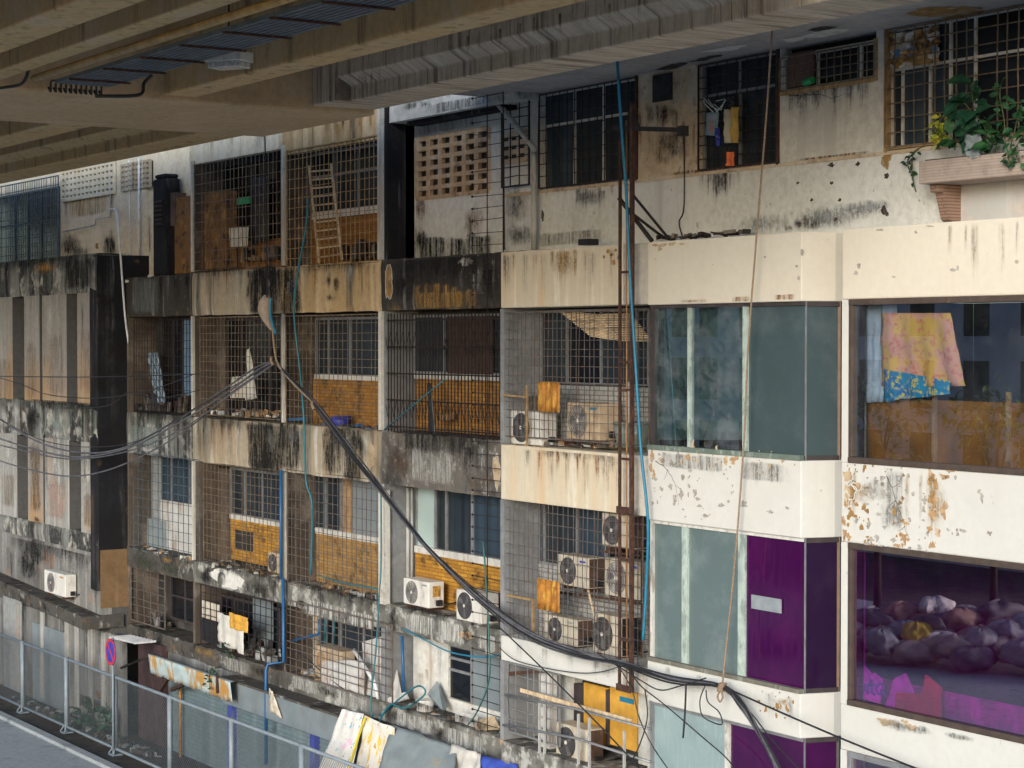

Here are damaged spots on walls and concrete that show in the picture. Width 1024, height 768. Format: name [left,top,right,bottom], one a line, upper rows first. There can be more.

peeling [881,150,892,179]
leakage [752,202,886,231]
leakage [397,192,529,296]
leakage [136,262,361,313]
leakage [27,399,93,438]
leakage [203,417,302,472]
leakage [323,428,362,480]
peeling [649,439,795,520]
peeling [841,464,966,552]
leakage [7,539,91,577]
spalling [209,568,244,590]